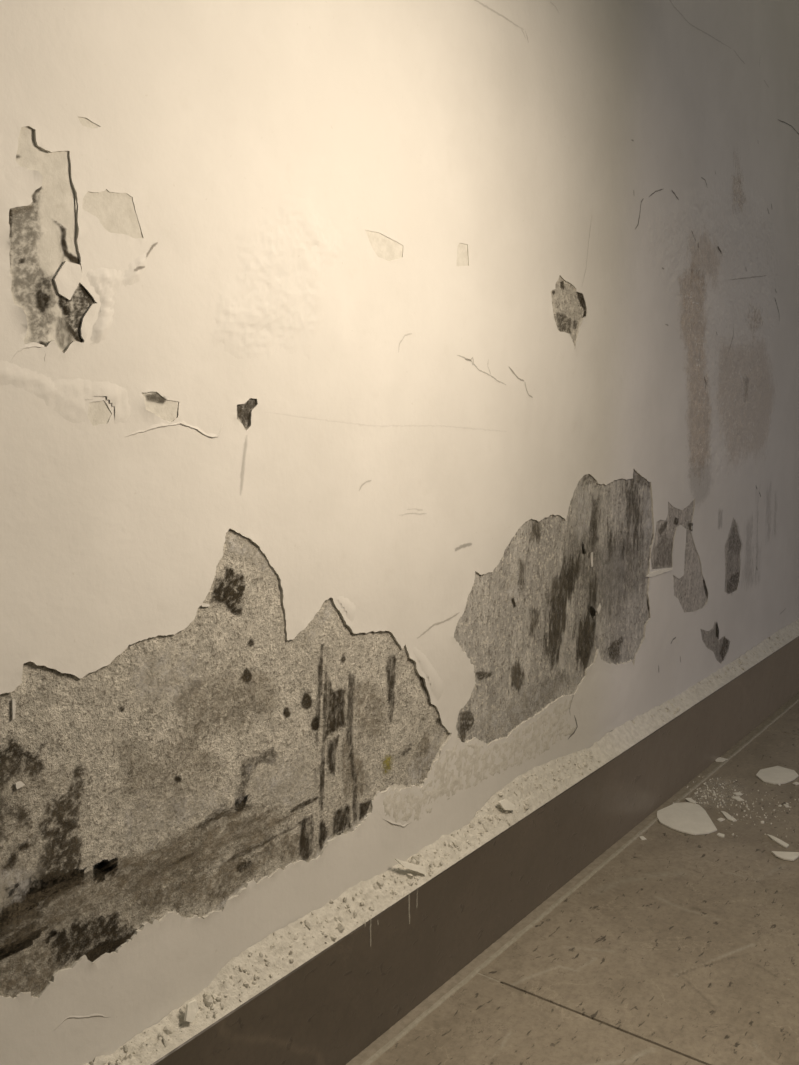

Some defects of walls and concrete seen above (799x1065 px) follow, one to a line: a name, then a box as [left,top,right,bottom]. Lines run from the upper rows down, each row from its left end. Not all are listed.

peeling [9,126,143,363]
spalling [551,276,586,344]
spalling [237,398,256,429]
flaking render [725,519,741,594]
flaking render [700,622,729,663]
flaking render [0,470,708,998]